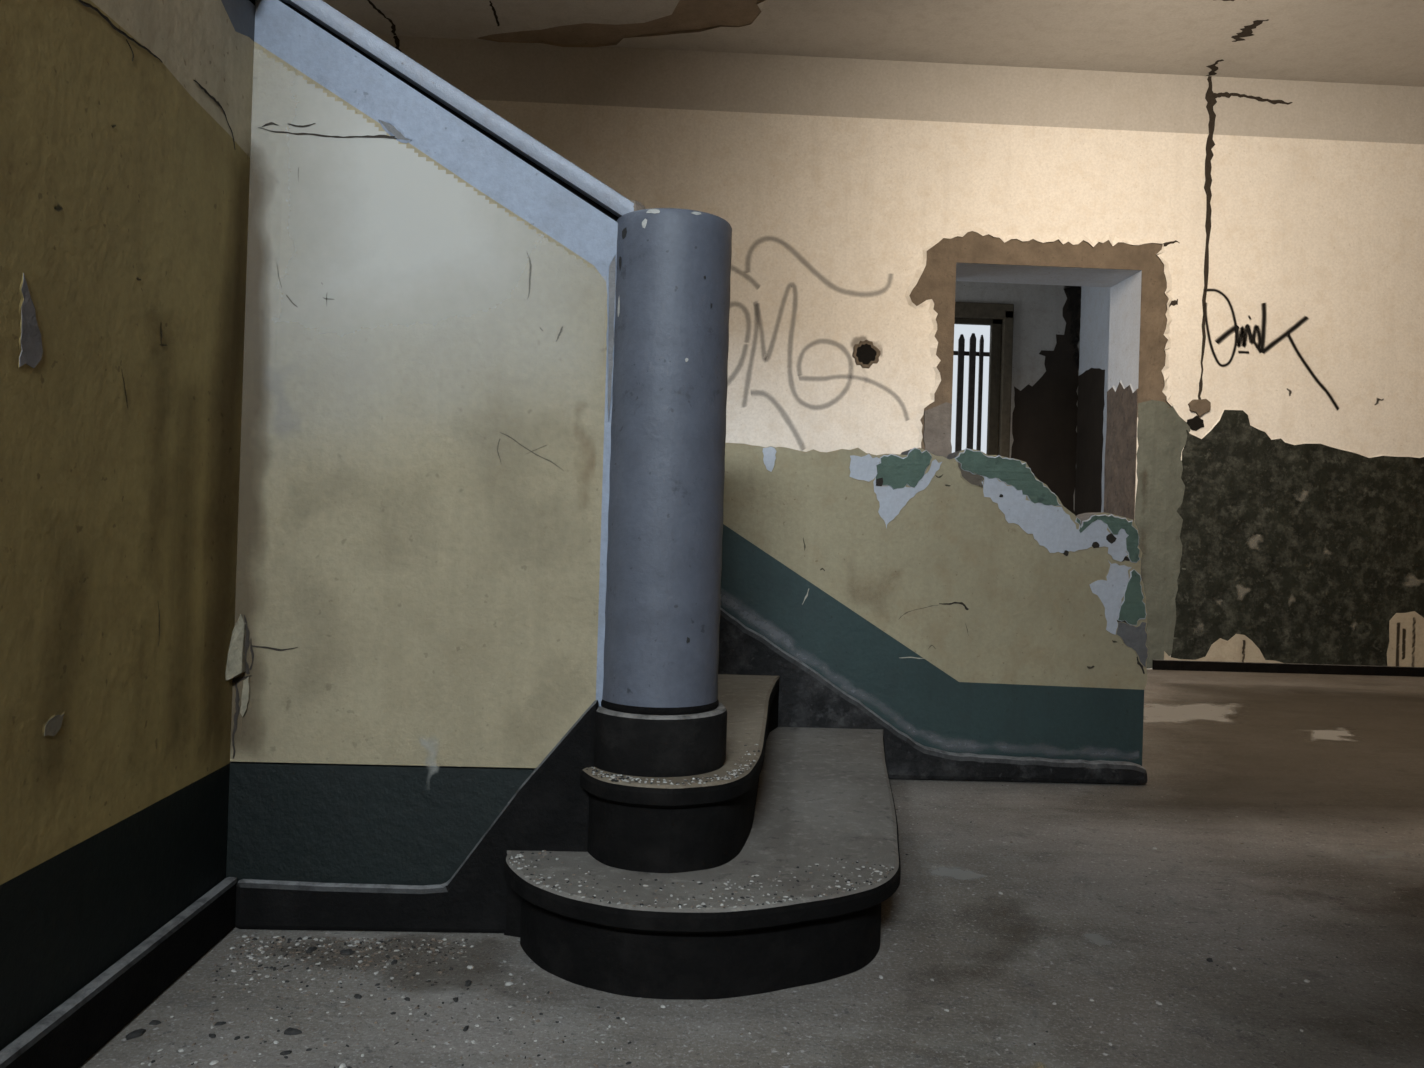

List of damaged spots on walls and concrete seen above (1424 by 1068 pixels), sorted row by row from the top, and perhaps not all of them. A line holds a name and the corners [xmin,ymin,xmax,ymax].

crack [78,0,162,62]
crack [367,0,402,52]
peeling [467,0,770,48]
crack [194,80,397,149]
crack [1187,0,1293,431]
peeling [18,272,43,369]
peeling [848,226,1424,674]